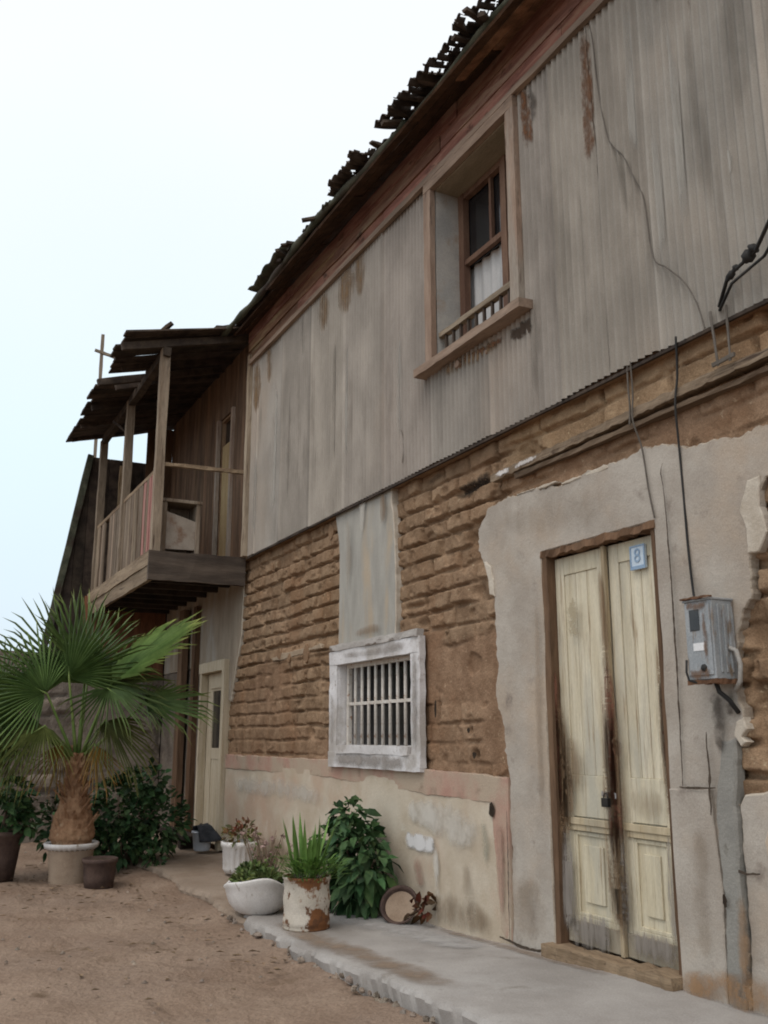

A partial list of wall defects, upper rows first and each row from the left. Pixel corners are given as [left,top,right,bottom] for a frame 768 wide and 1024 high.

rust [520,91,532,140]
rust [580,40,594,155]
crack [584,25,598,174]
spalling [397,310,768,797]
water stain [598,574,628,933]